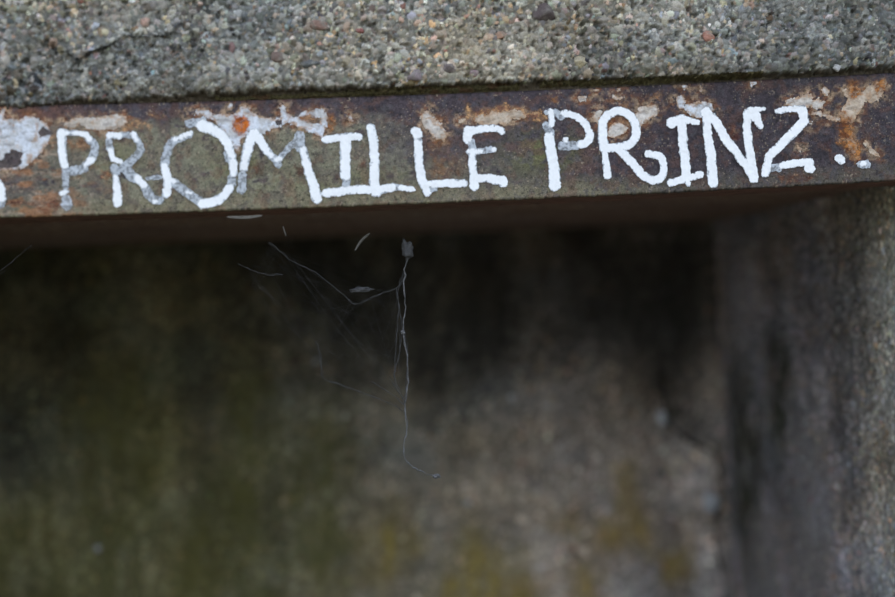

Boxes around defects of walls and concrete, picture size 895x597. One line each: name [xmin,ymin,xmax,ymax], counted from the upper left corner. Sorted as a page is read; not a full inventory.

corrosion [466,102,548,122]
corrosion [232,116,249,136]